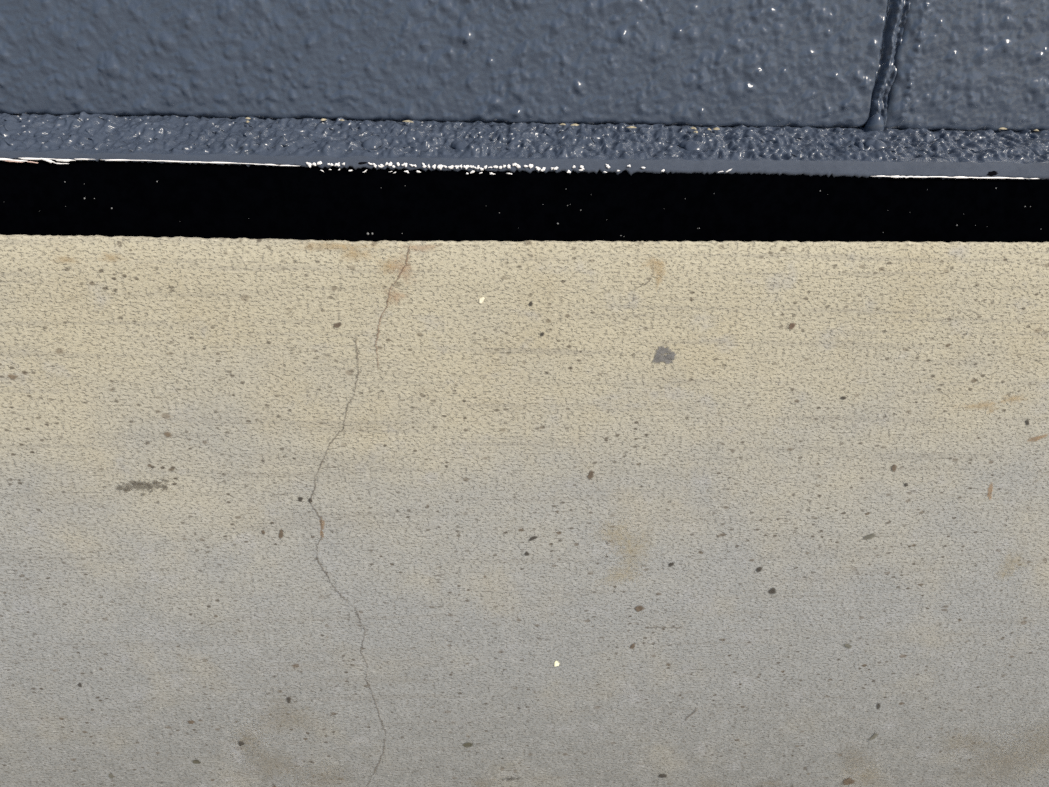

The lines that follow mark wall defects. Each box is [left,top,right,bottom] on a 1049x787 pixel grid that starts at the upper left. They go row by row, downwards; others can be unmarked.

crack [310,244,411,775]